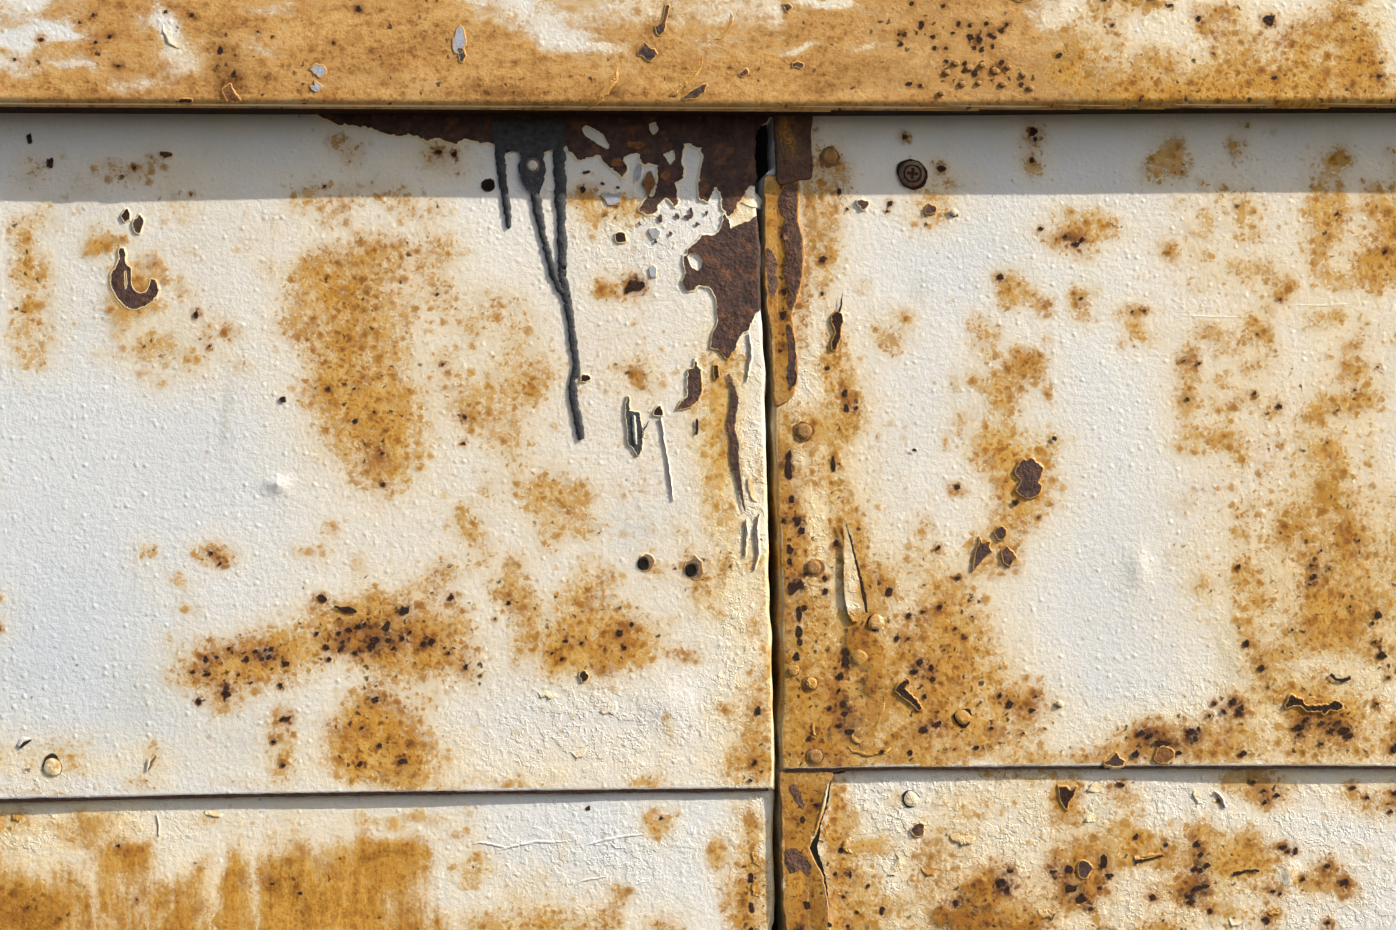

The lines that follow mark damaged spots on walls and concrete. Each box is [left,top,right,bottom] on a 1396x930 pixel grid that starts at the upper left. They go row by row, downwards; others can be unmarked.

corrosion [0,0,1396,175]
corrosion [6,205,56,372]
peeling [108,207,161,311]
peeling [312,57,803,435]
corrosion [165,181,698,790]
corrosion [651,136,1396,930]
corrosion [0,811,448,930]
corrosion [448,850,491,891]
corrosion [464,884,633,930]
corrosion [643,807,680,842]
peeling [789,784,805,810]
peeling [785,848,811,877]